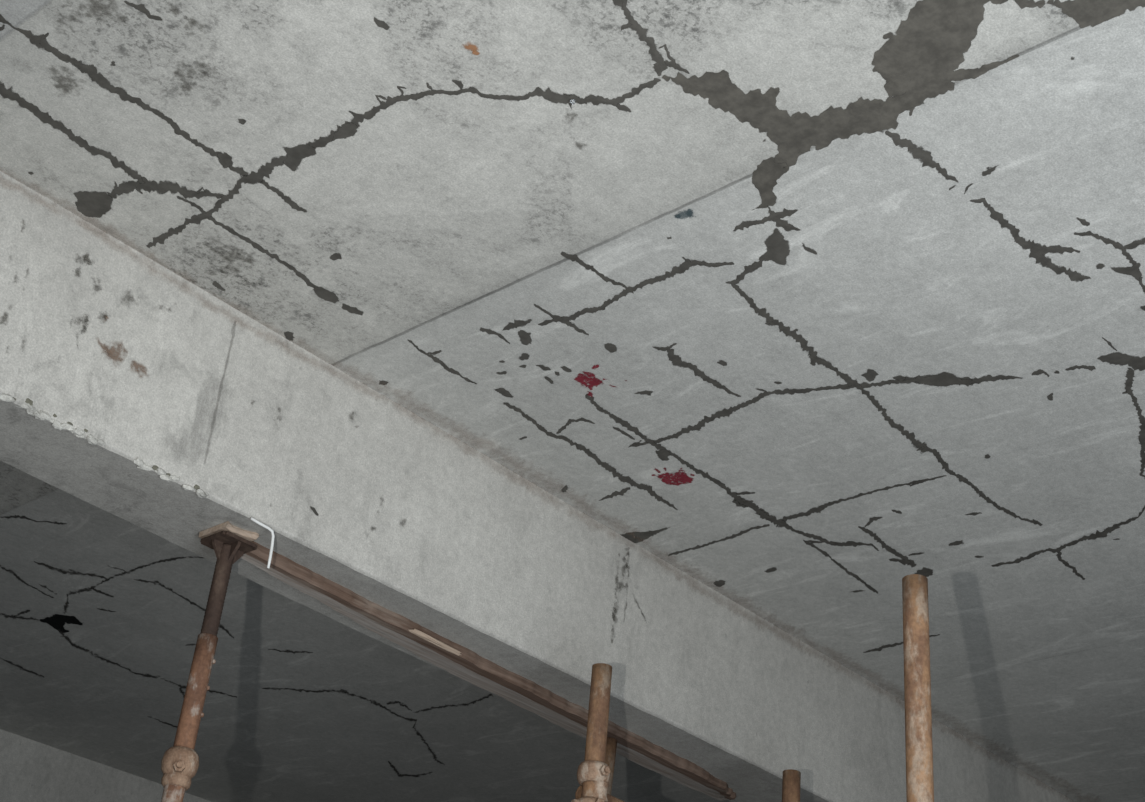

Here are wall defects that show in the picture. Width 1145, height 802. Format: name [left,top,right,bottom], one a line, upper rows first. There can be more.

crack [0,0,689,315]
crack [885,130,1145,311]
corrosion [98,341,146,374]
crack [408,205,1145,593]
crack [1,515,67,524]
crack [0,557,493,777]